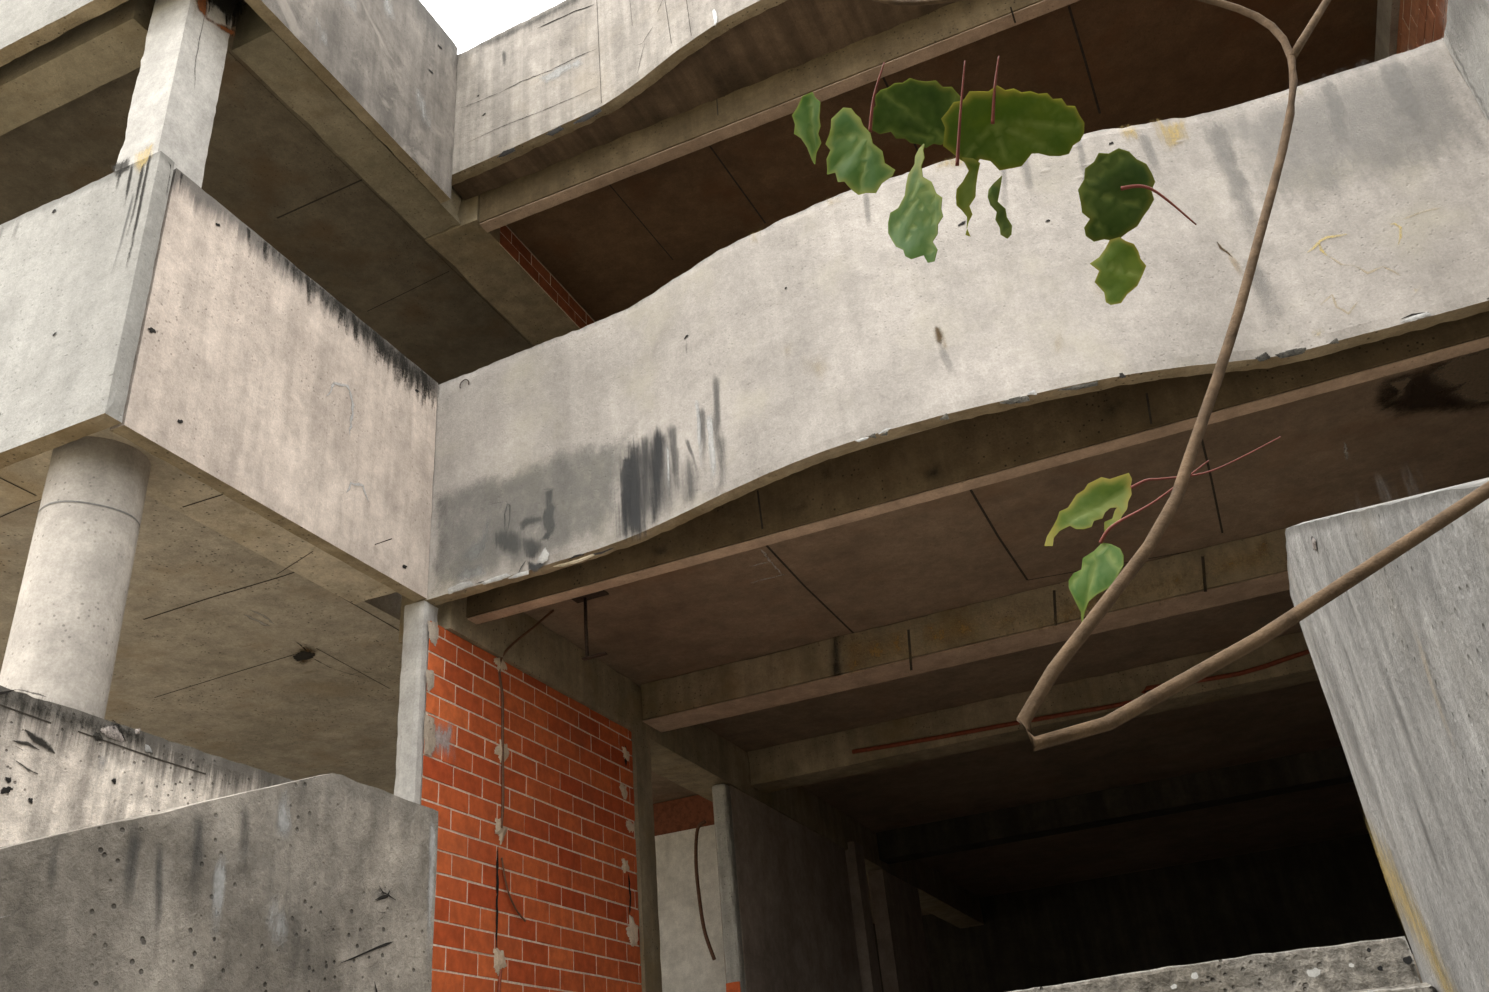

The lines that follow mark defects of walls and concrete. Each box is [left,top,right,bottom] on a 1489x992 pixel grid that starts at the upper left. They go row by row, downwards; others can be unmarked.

damp [112,156,151,260]
damp [247,228,439,407]
damp [1378,348,1489,414]
damp [621,385,719,536]
crack [0,689,46,697]